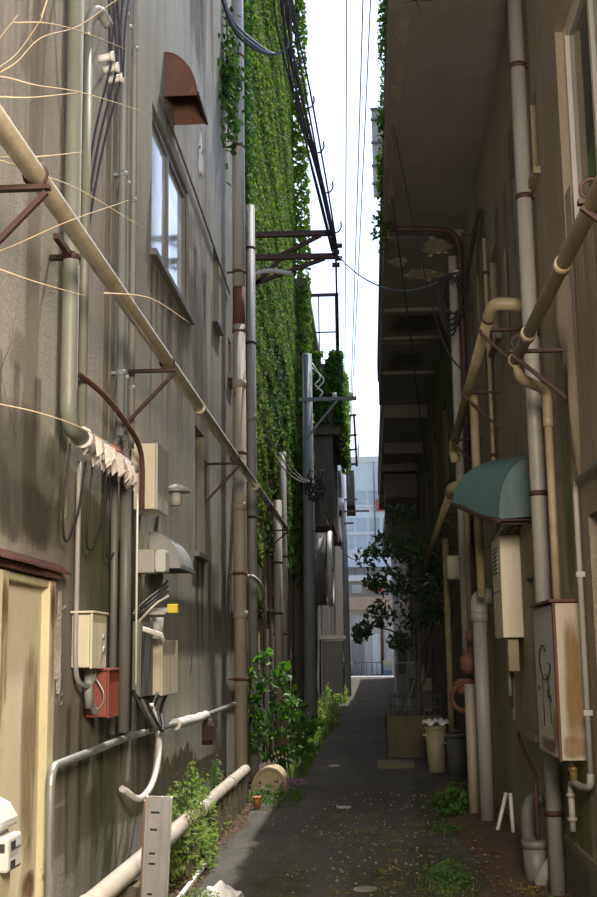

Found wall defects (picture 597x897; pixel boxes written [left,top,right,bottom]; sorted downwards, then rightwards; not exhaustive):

rust [544,640,582,757]